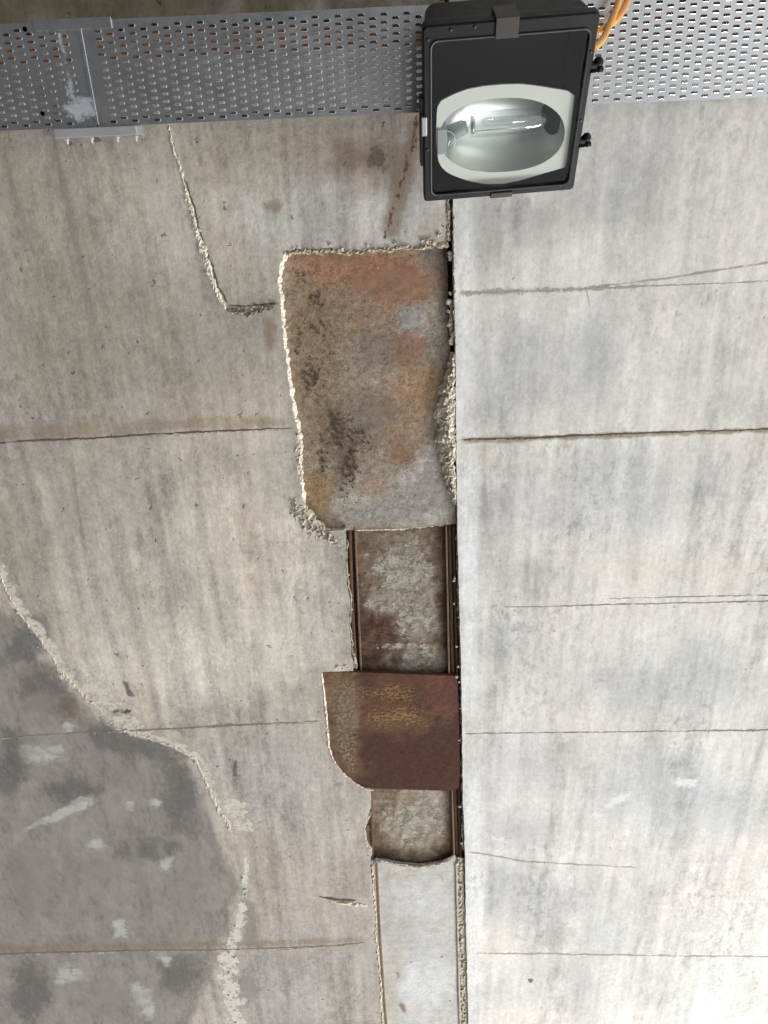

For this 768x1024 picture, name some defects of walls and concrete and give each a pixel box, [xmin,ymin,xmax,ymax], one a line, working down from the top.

crack [168,126,281,318]
spalling [193,199,465,850]
peeling [0,563,256,832]
corrosion [352,625,395,662]
damp [0,618,250,1024]
spalling [319,812,384,1024]
crack [471,852,634,868]